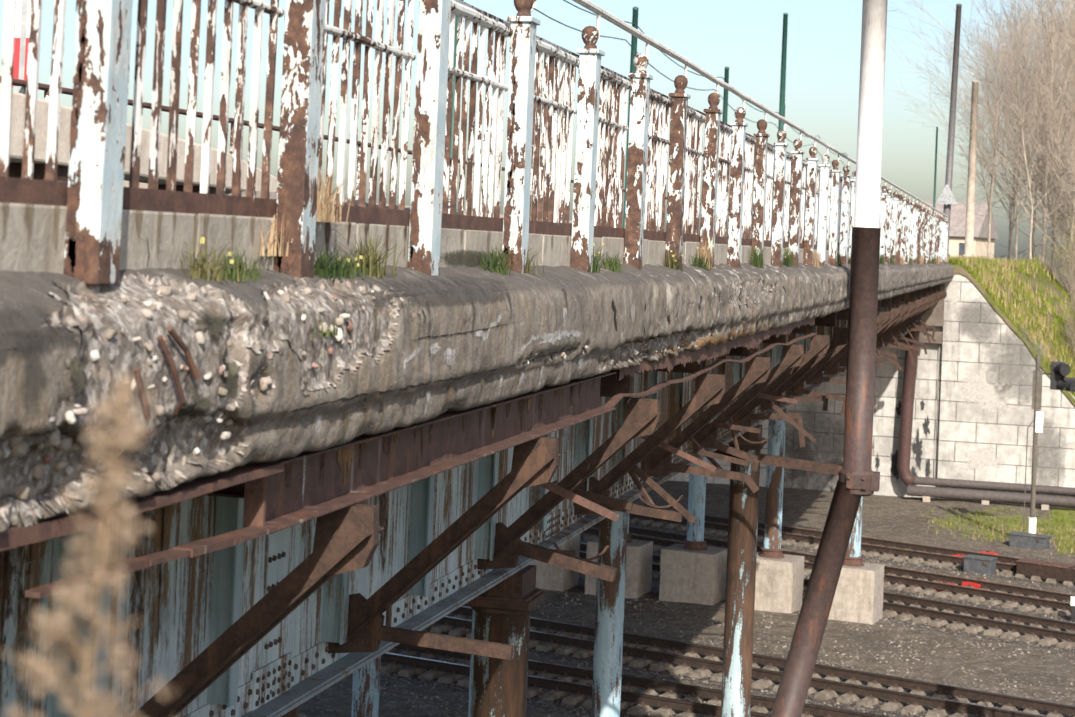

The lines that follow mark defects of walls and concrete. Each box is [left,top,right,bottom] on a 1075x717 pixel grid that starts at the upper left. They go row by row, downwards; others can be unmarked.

peeling [408,34,429,272]
spalling [0,0,421,533]
rust [619,317,770,366]
rust [0,540,46,712]
rust [113,495,217,709]
rust [242,542,255,611]
rust [358,492,388,571]
rust [434,469,452,530]